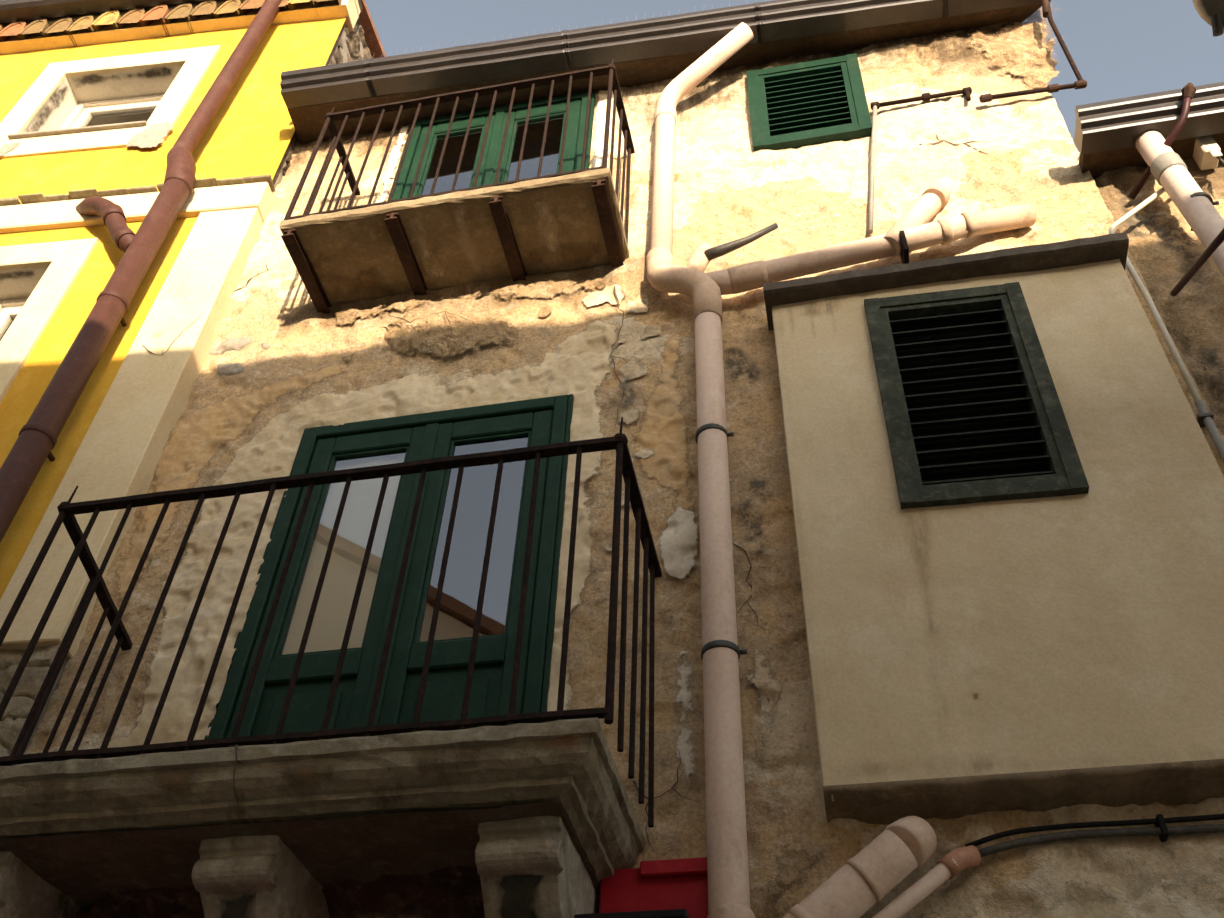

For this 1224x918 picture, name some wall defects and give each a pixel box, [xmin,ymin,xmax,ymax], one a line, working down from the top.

crack [919,132,992,154]
crack [609,286,661,437]
flaking render [96,284,662,749]
crack [732,543,771,630]